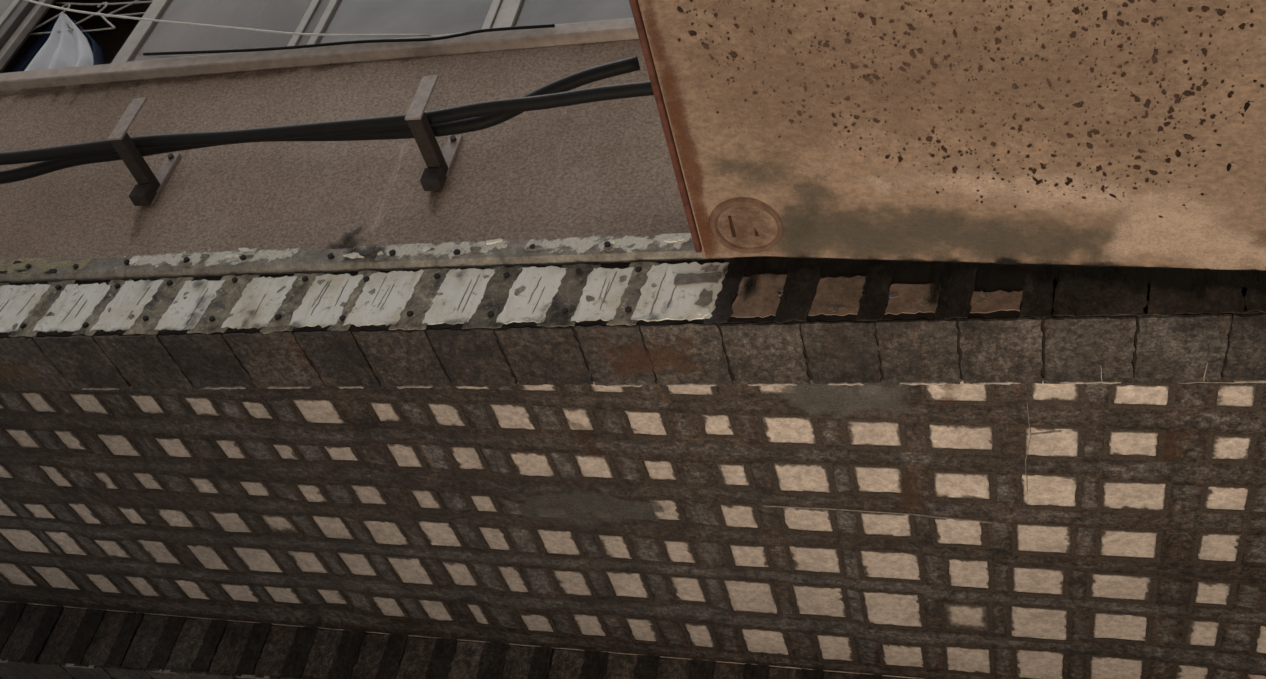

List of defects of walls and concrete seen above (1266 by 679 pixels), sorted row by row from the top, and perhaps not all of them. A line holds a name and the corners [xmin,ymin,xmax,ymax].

water stain [677,0,1266,304]
peeling [0,247,300,333]
peeling [221,239,508,329]
peeling [496,233,729,324]
peeling [731,273,787,318]